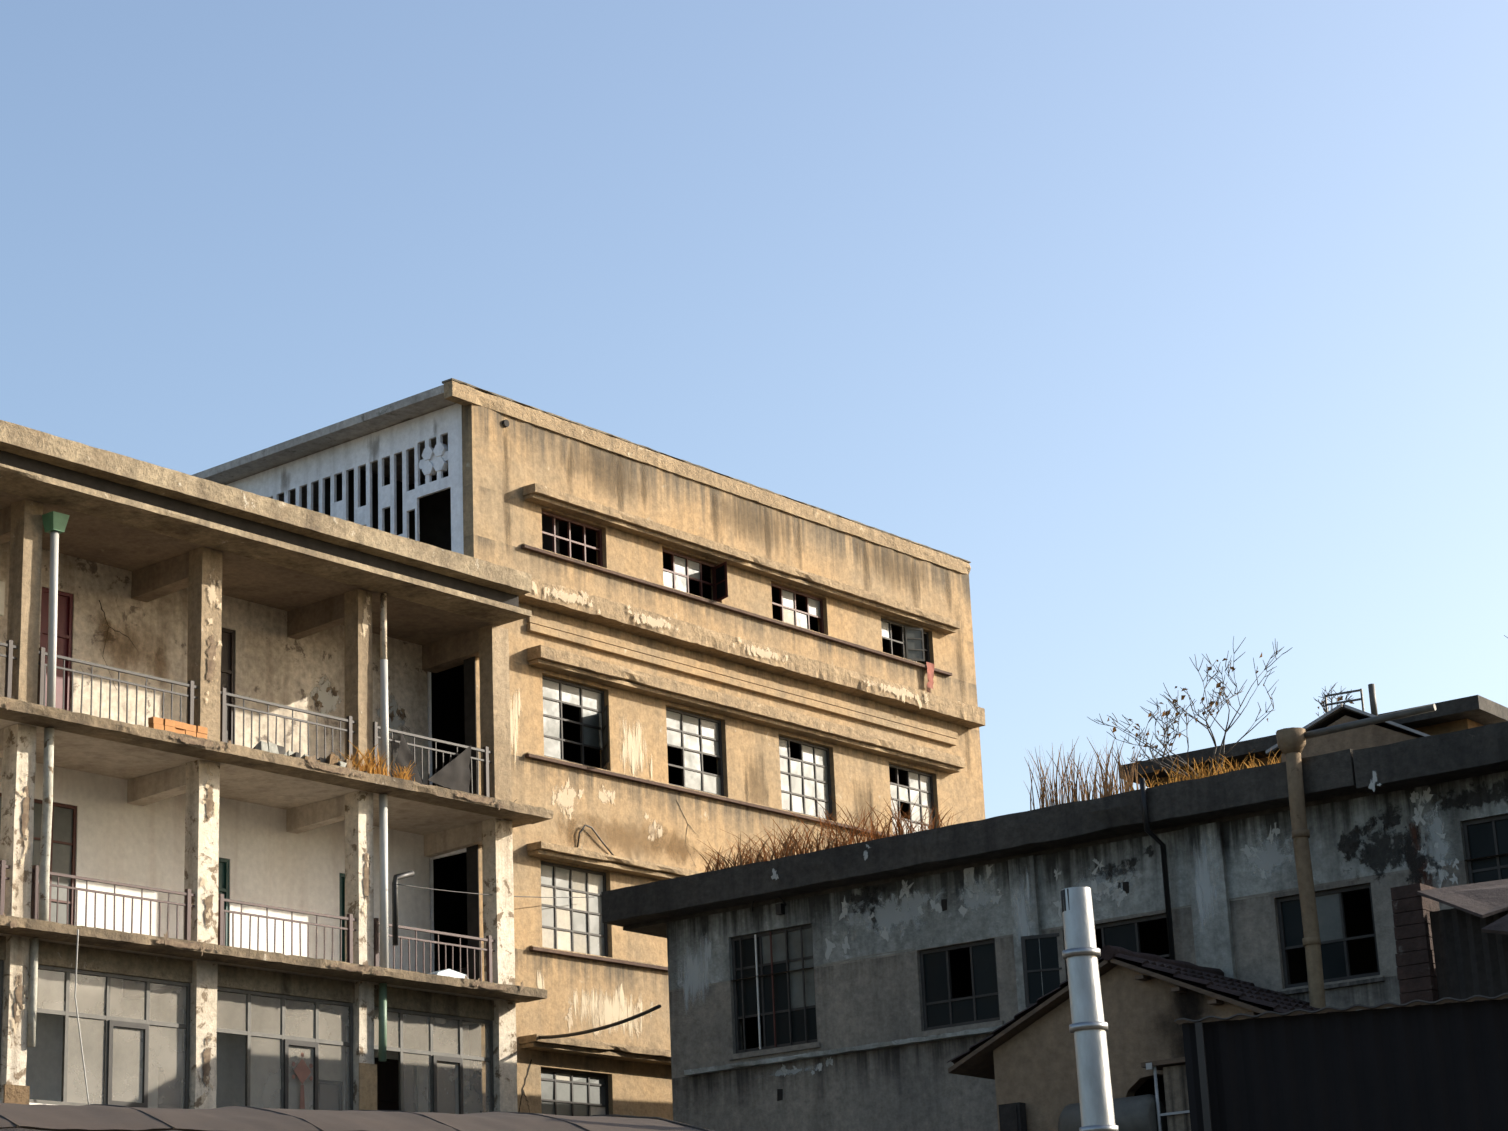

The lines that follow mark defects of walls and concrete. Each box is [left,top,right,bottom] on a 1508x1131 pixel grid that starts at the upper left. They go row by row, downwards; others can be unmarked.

peeling [18,774,31,865]
peeling [362,828,374,921]
peeling [825,864,1004,961]
peeling [1079,859,1133,907]
water stain [1092,845,1154,888]
water stain [1337,804,1440,883]
spalling [1410,787,1459,888]
water stain [1438,778,1508,810]
peeling [12,975,29,1035]